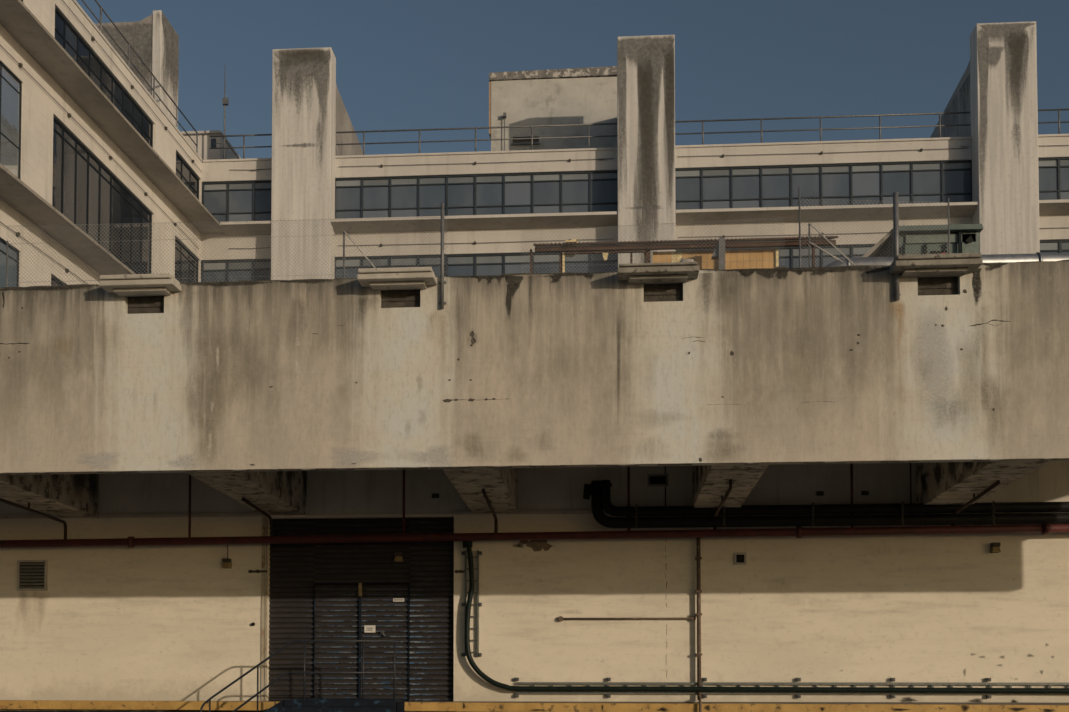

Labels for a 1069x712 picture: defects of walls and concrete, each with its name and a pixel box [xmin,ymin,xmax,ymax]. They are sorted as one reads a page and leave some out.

water stain [274,50,331,158]
water stain [961,23,1033,173]
water stain [618,37,674,230]
water stain [449,275,523,314]
water stain [544,273,596,282]
water stain [715,266,890,279]
water stain [972,263,1008,302]